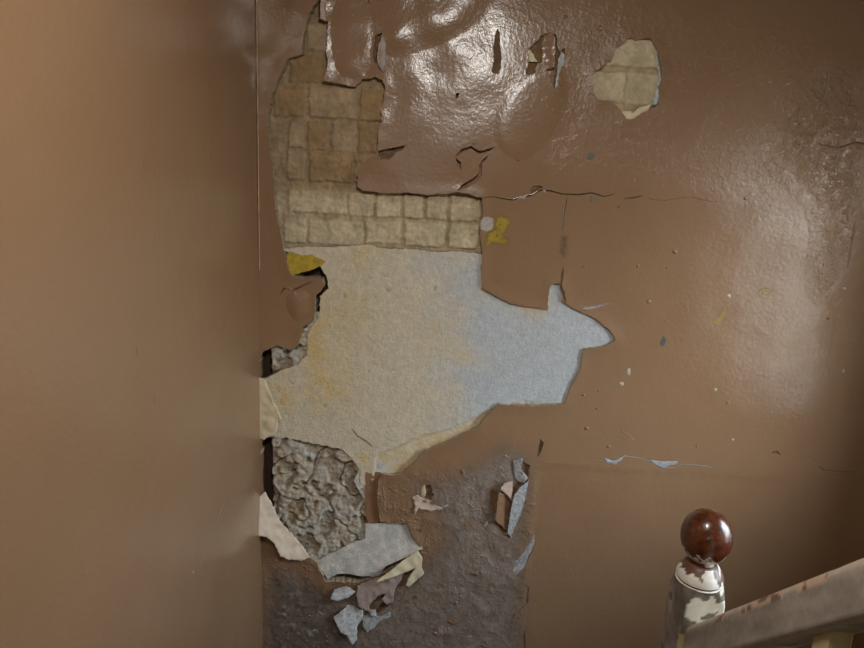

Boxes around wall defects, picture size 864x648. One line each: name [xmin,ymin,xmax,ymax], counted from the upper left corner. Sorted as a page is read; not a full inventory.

flaking render [592,39,661,119]
crack [484,188,722,231]
peeling [259,0,615,612]